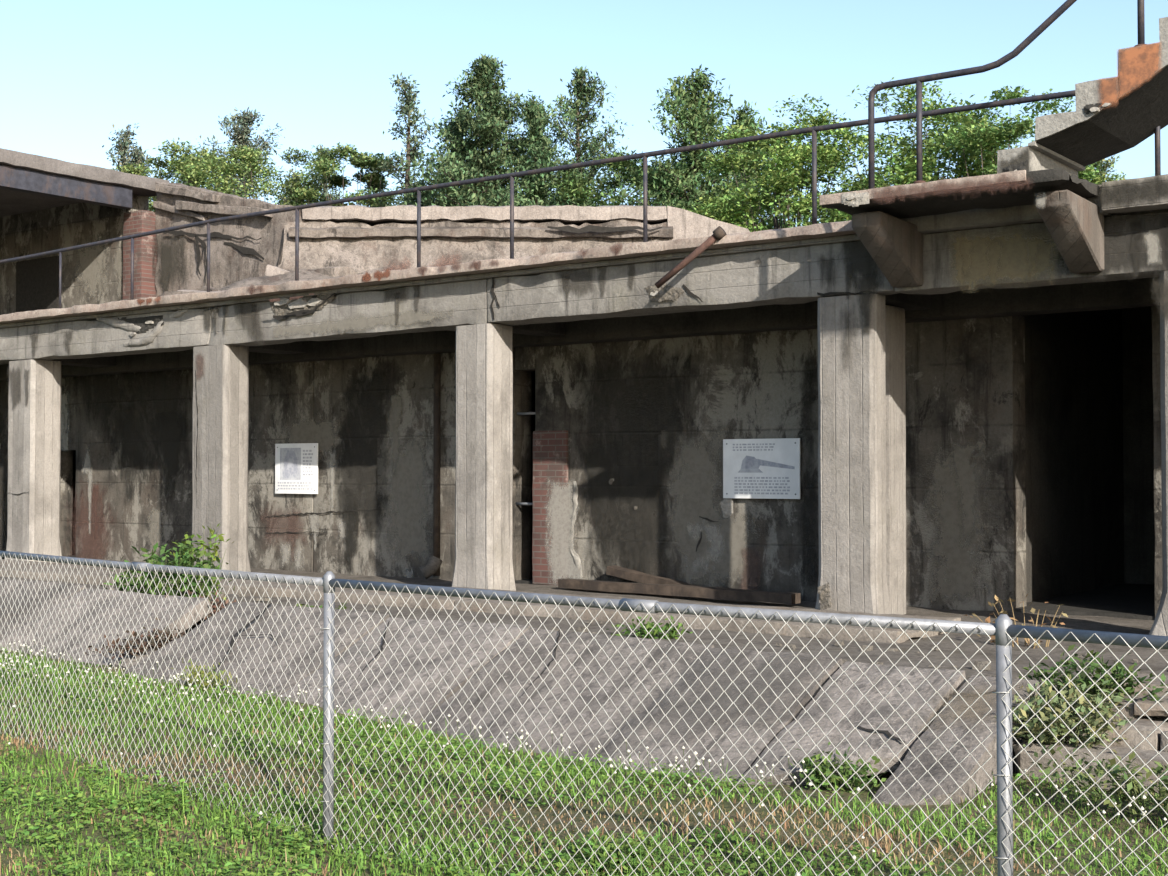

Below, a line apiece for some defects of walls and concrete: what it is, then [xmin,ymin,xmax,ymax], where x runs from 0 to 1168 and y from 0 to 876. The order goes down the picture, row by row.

corrosion [1100,42,1160,105]
spalling [117,315,163,334]
crack [490,277,500,320]
damp [281,368,433,578]
damp [578,352,760,590]
damp [801,360,818,585]
crack [210,602,282,674]
crack [856,725,905,743]